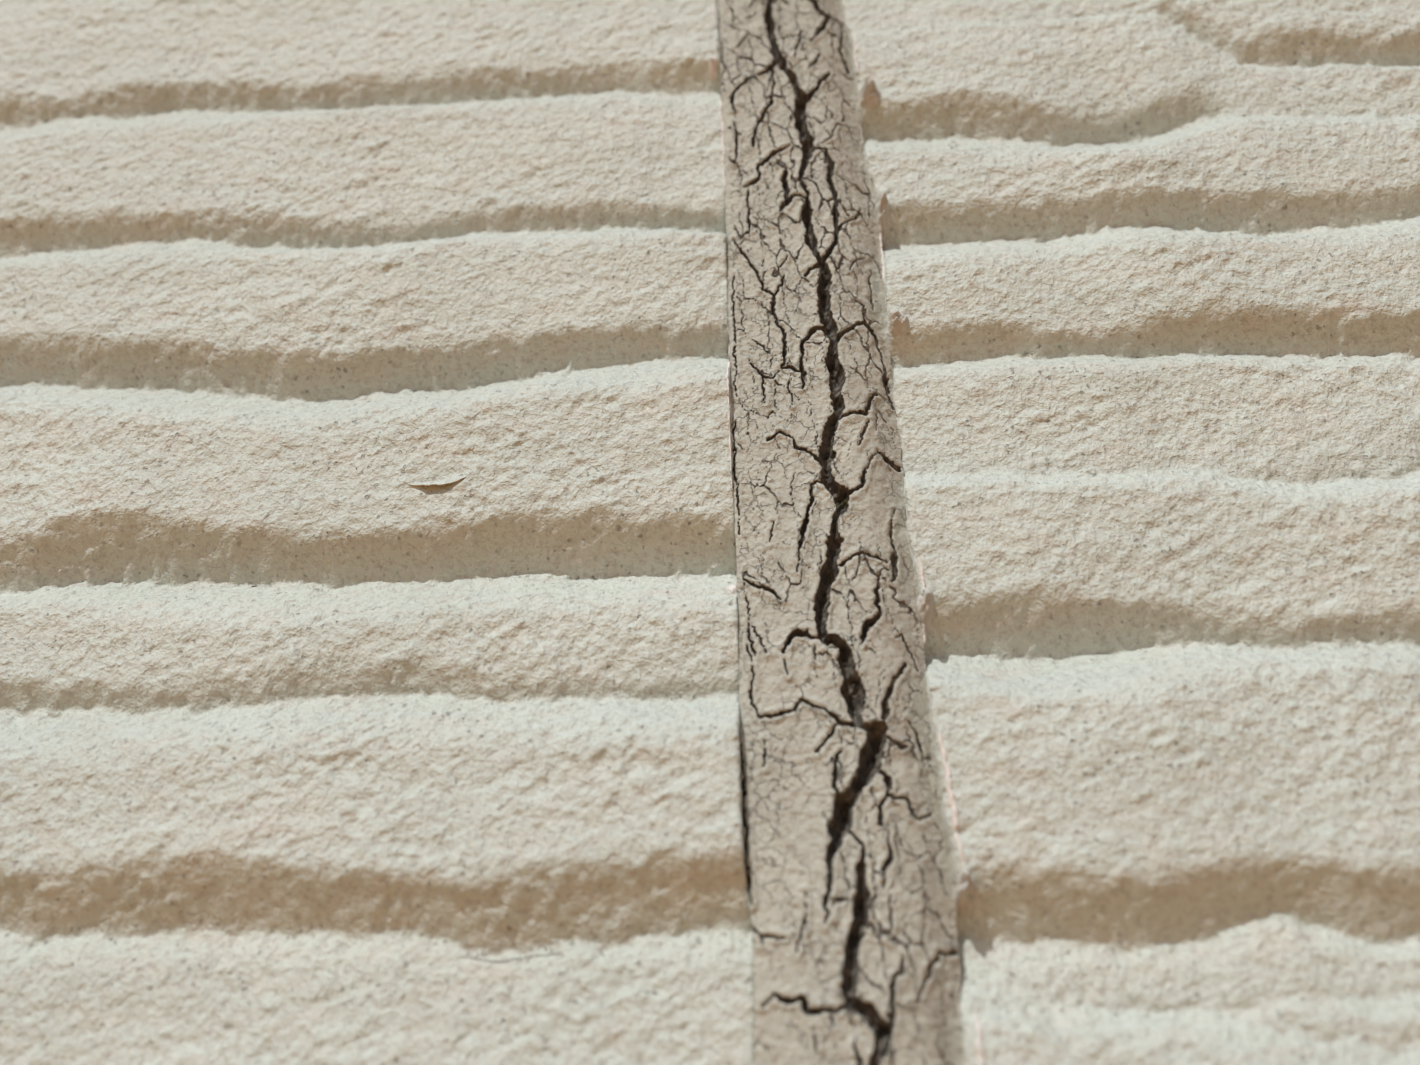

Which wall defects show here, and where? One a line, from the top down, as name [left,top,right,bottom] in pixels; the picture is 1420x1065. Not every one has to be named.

crack [721,0,958,1065]